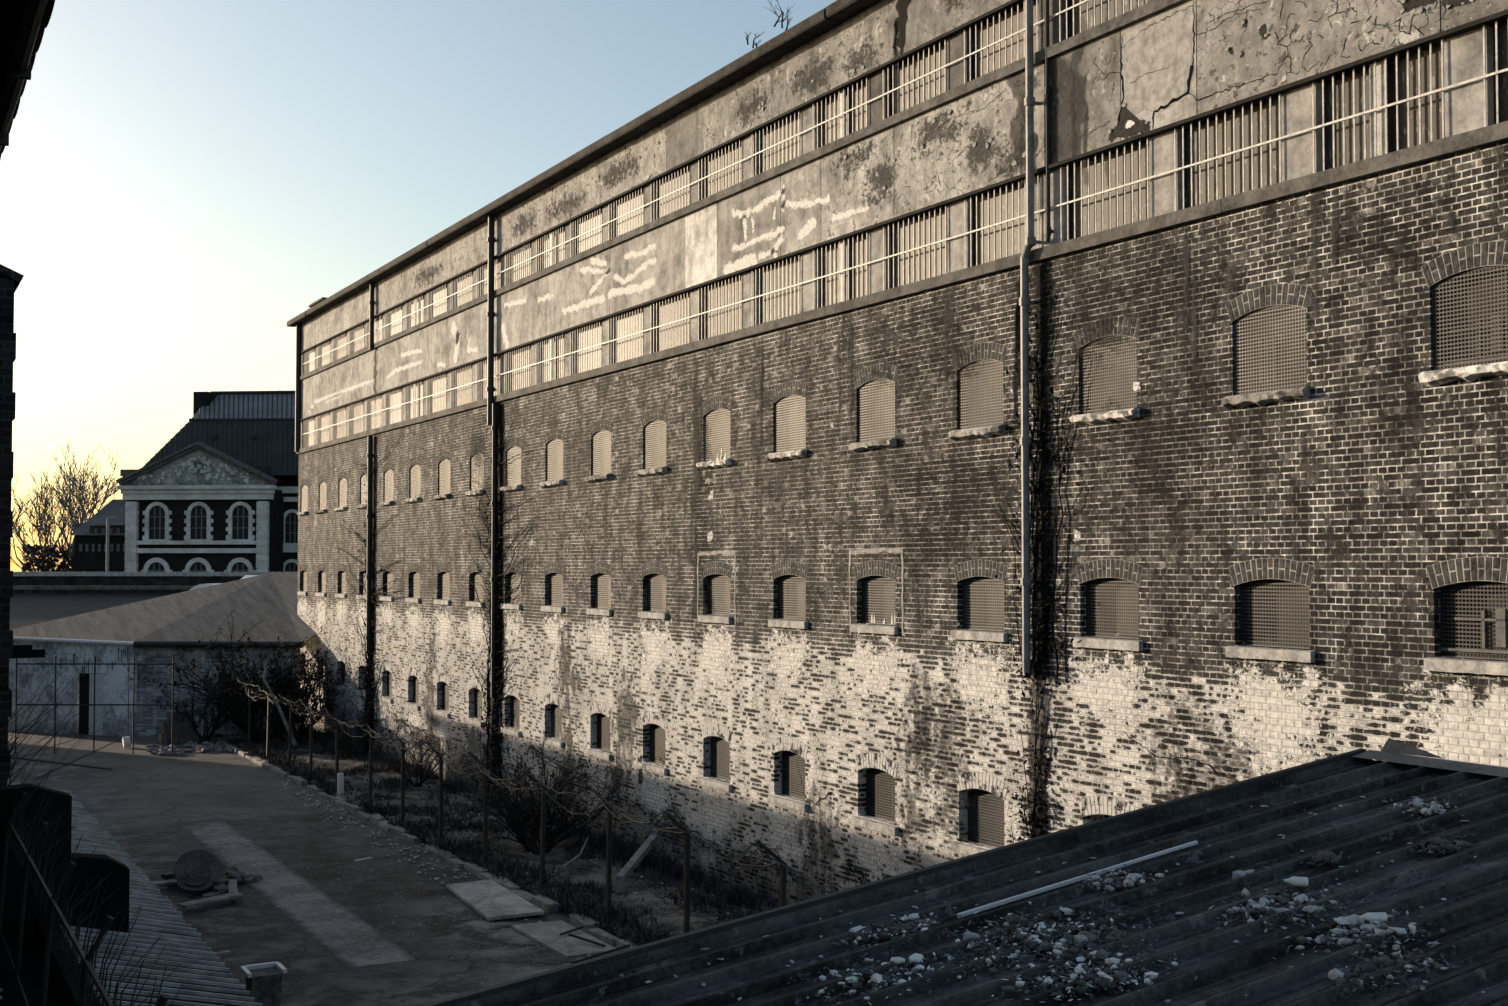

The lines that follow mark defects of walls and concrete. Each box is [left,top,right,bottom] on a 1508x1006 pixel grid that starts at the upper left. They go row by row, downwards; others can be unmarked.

damp [892,0,911,114]
spalling [1108,102,1150,143]
crack [1081,0,1449,137]
spalling [1400,0,1475,14]
damp [298,401,524,794]
damp [946,259,1214,837]
damp [543,608,944,893]
damp [1217,659,1331,776]
damp [1399,670,1508,766]